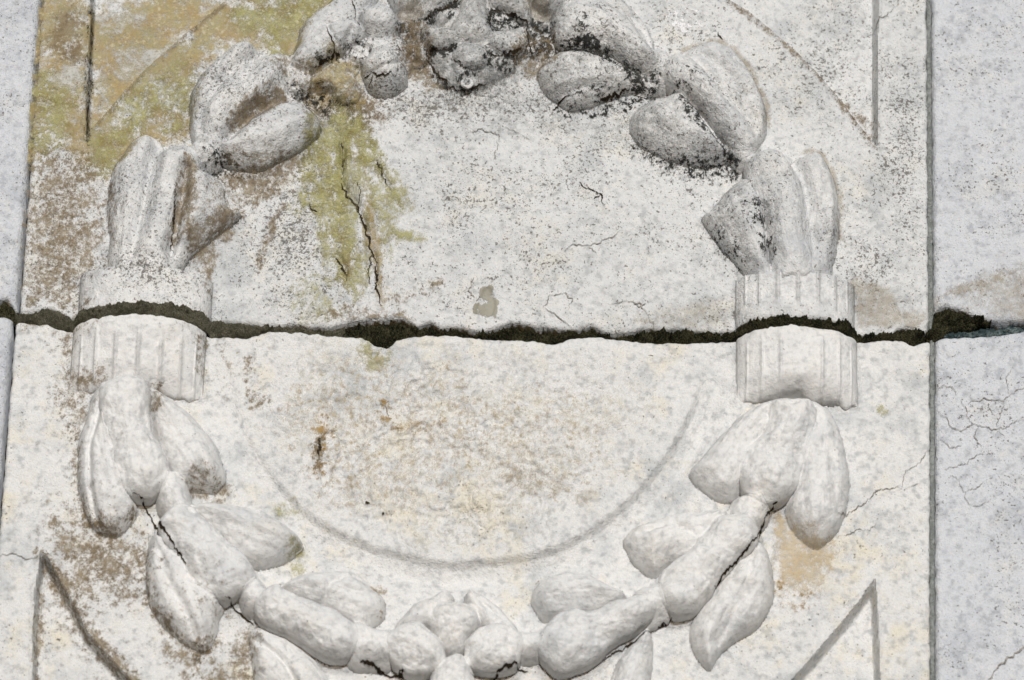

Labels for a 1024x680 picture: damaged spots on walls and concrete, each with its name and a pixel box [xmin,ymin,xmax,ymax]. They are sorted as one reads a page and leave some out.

water stain [21,0,124,311]
water stain [167,54,412,302]
crack [335,142,386,306]
crack [543,292,573,325]
crack [133,492,186,565]
crack [715,502,777,589]
crack [228,596,254,625]
crack [602,618,672,661]